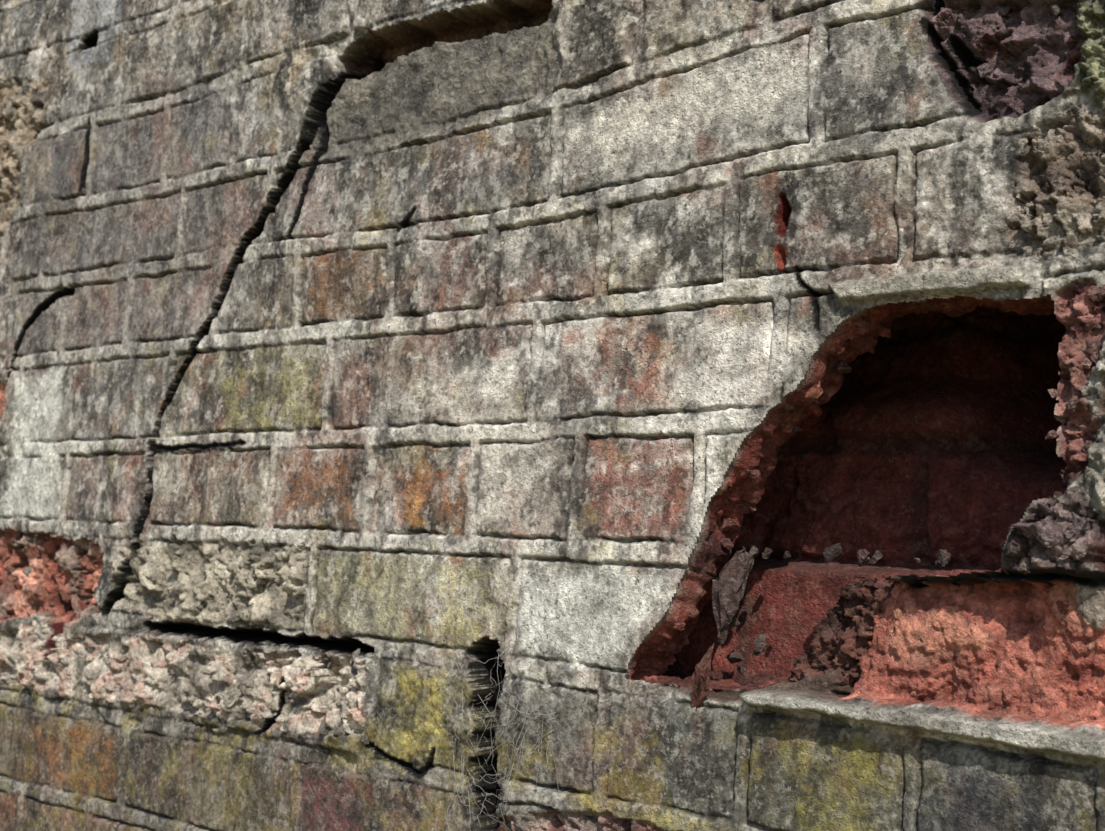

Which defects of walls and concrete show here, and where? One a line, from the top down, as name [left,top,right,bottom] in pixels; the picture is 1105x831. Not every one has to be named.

crack [395,205,417,233]
spalling [918,0,1105,265]
crack [6,285,79,382]
crack [101,52,385,619]
spalling [625,275,1105,729]
spalling [0,527,370,746]
spalling [492,805,685,831]